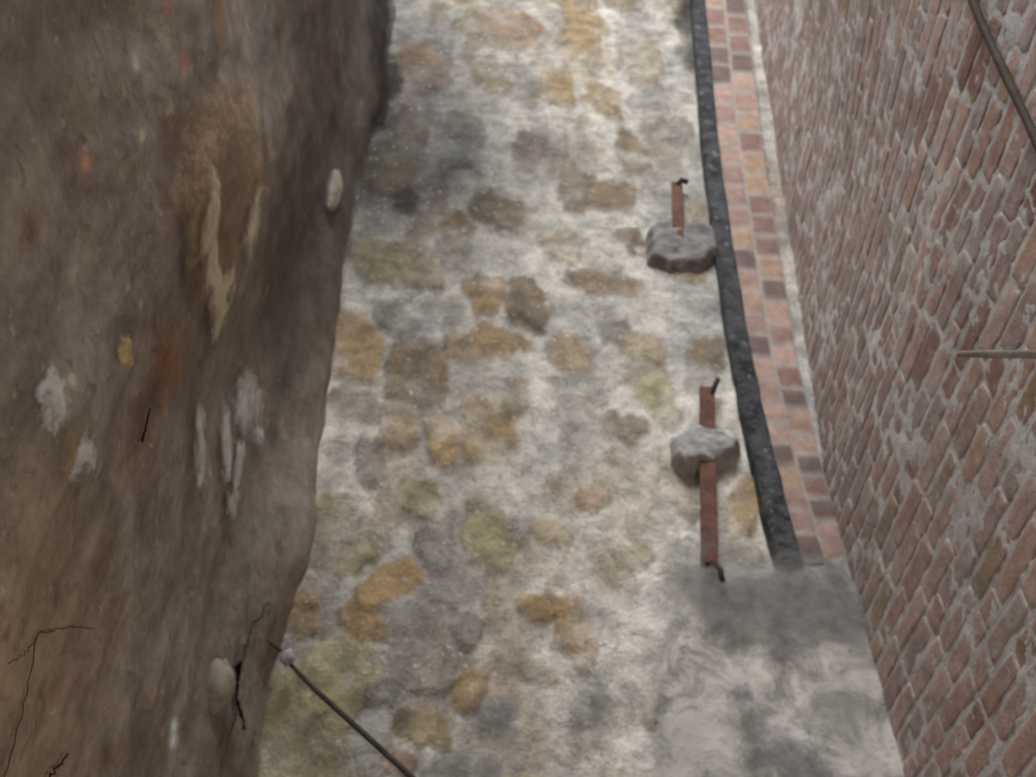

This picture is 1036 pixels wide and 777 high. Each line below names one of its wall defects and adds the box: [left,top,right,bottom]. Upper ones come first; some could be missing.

efflorescence [37,367,66,425]
efflorescence [64,436,96,475]
crack [140,408,151,443]
efflorescence [196,410,211,486]
efflorescence [222,373,263,512]
crack [4,626,93,777]
crack [219,602,270,777]